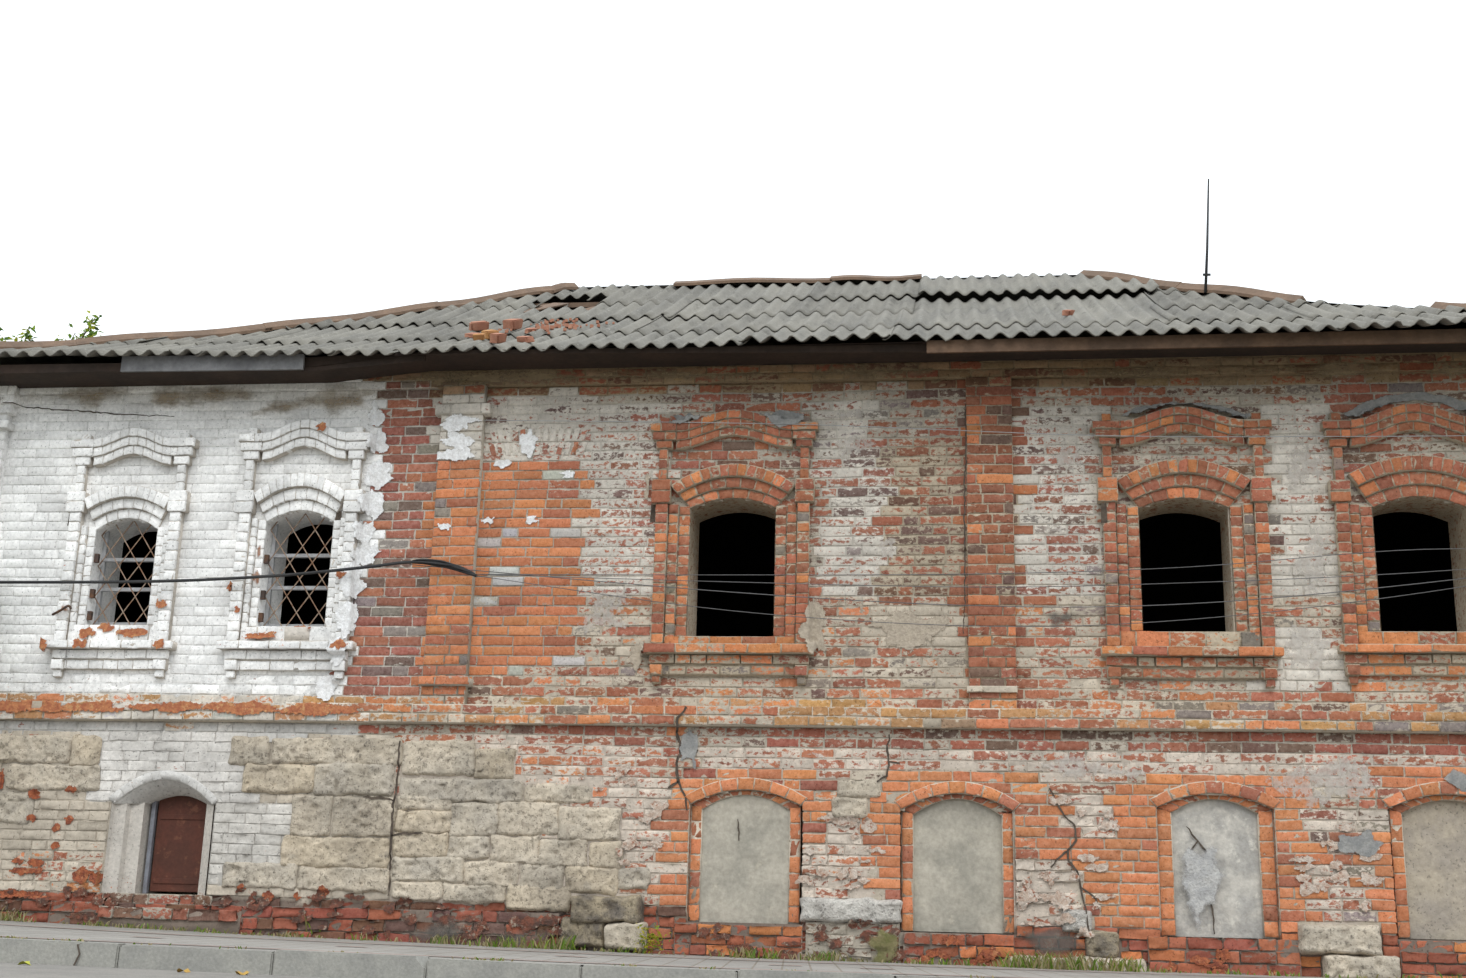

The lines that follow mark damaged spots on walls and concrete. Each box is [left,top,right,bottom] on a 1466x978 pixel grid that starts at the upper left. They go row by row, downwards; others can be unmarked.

peeling [436,413,482,461]
peeling [493,428,539,469]
spalling [1048,794,1120,831]
spalling [795,815,886,890]
spalling [220,883,274,911]
spalling [291,885,563,948]
spalling [1017,854,1109,938]
spalling [1092,894,1116,910]
spalling [697,922,759,958]
spalling [774,919,965,964]
spalling [971,946,1002,966]